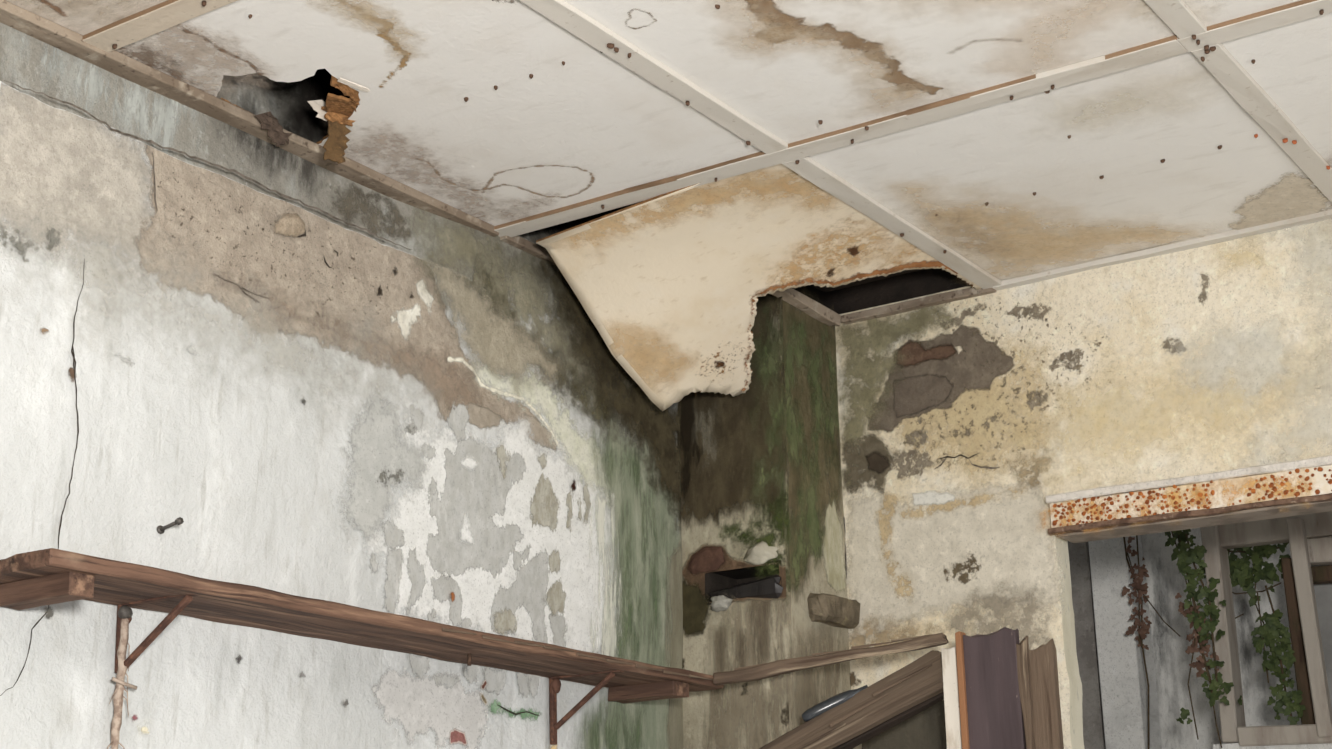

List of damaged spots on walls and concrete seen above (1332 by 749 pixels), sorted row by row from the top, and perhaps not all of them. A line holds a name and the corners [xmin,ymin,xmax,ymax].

water stain [745,0,943,102]
water stain [930,209,1177,272]
crack [58,258,85,549]
peeling [0,83,619,653]
water stain [330,134,898,669]
peeling [868,299,1103,478]
rust [1043,467,1332,535]
crack [0,605,54,696]
water stain [667,698,684,749]
water stain [707,601,861,749]